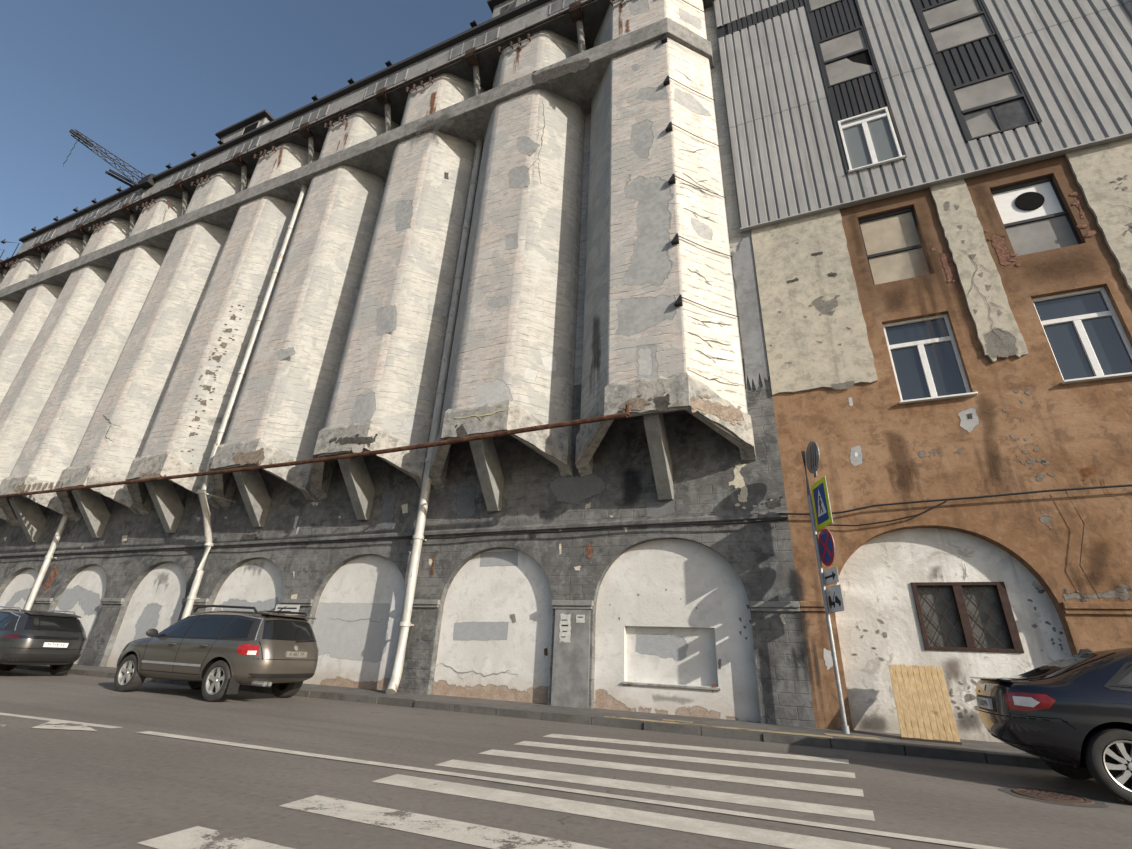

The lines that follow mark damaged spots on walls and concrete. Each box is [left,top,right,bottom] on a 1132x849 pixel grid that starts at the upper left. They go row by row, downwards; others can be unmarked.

crack [678,148,719,221]
spalling [181,305,245,464]
spalling [618,392,671,412]
peeling [615,174,676,379]
crack [687,315,739,386]
peeling [804,295,840,318]
crack [962,250,1009,341]
peeling [984,310,1017,358]
peeling [729,463,786,522]